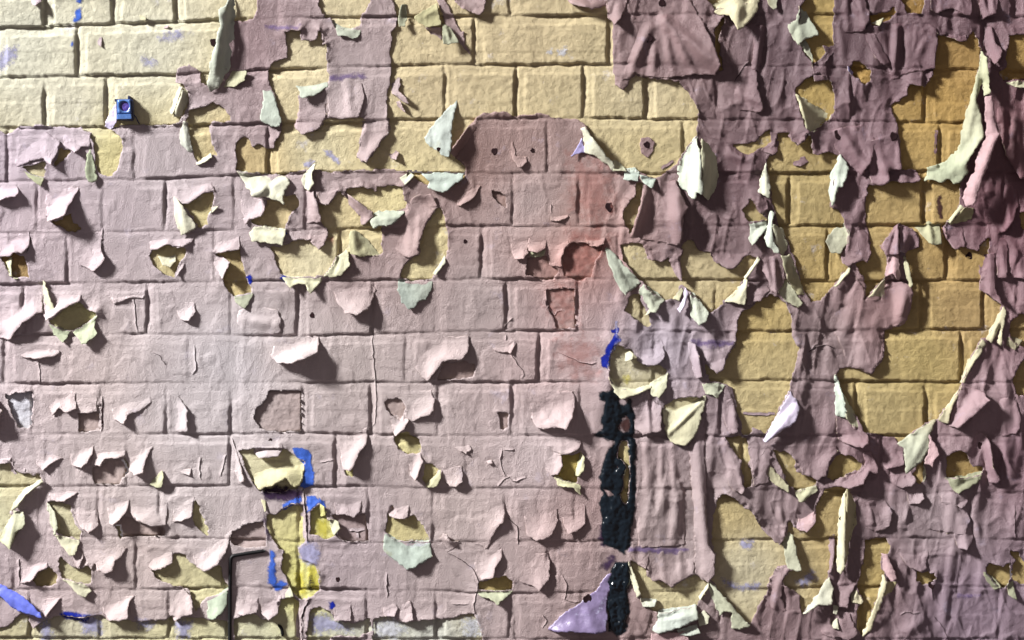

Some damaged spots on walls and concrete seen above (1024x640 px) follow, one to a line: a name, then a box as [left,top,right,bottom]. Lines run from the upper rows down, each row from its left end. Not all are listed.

peeling [149,183,218,277]
peeling [210,0,1024,640]
peeling [0,391,34,428]
peeling [49,391,100,432]
peeling [112,397,151,424]
peeling [175,396,188,432]
peeling [0,445,482,640]